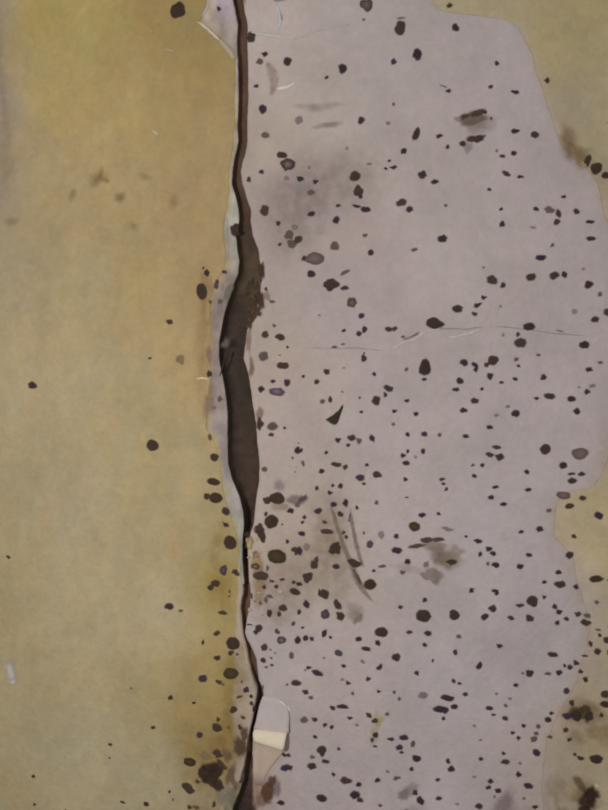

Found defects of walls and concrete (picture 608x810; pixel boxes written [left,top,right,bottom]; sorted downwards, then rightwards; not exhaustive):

damp [323,270,367,336]
crack [219,0,264,810]
peeling [198,0,608,810]
mould [460,356,503,384]
mould [204,478,236,549]
damp [255,483,307,543]
damp [251,508,348,658]
damp [392,513,461,584]
damp [416,598,431,647]
damp [182,668,256,807]
damp [433,679,468,720]
damp [531,688,608,756]